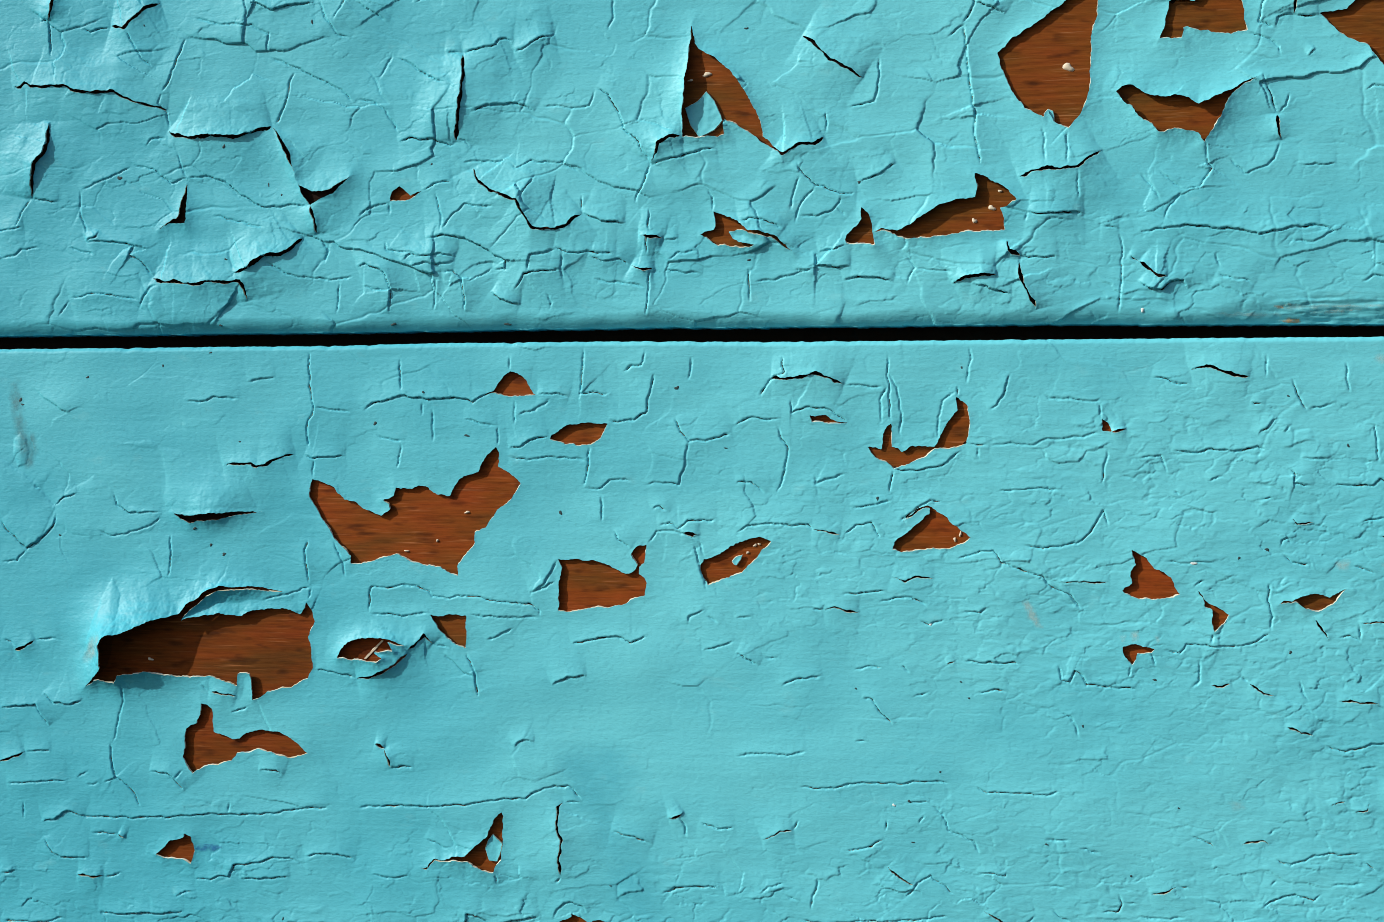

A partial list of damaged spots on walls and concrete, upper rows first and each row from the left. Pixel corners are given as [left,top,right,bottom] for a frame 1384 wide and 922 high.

peeling [677,15,787,158]
peeling [840,169,1023,252]
crack [704,0,1340,318]
peeling [993,0,1267,148]
crack [0,482,174,582]
peeling [304,443,526,581]
peeling [554,540,653,618]
crack [183,344,1384,819]
peeling [80,581,410,778]
crack [0,684,589,922]
crack [609,749,1225,922]
crack [1190,828,1382,912]